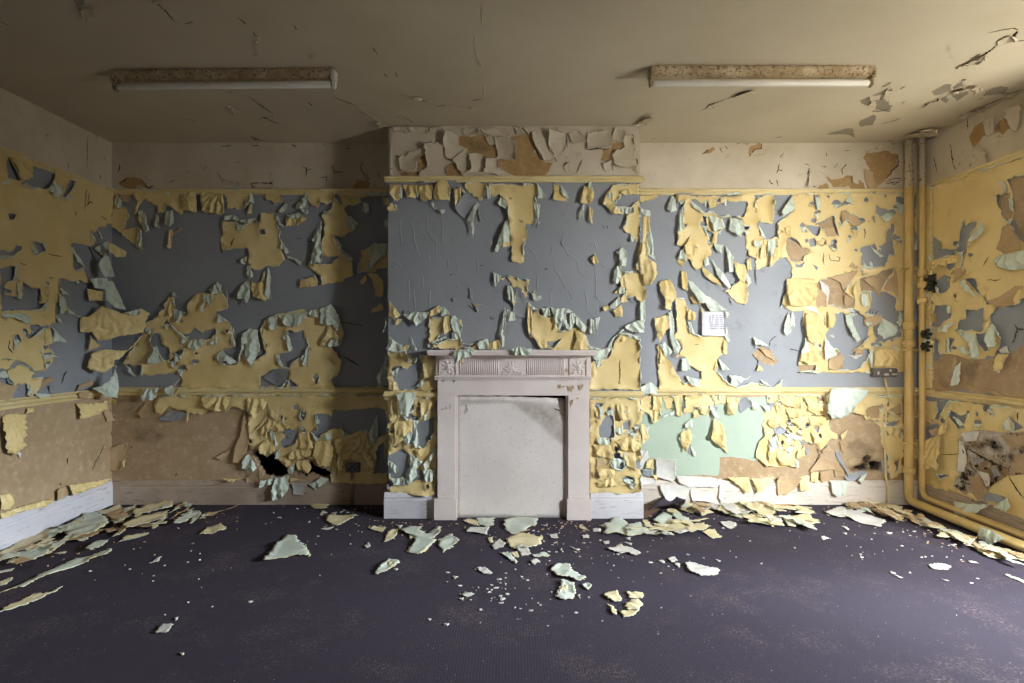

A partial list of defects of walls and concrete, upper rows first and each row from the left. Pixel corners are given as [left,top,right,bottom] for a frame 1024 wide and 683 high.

crack [957,28,1024,70]
peeling [0,79,1024,520]
water stain [953,430,1024,501]
peeling [977,527,1005,544]